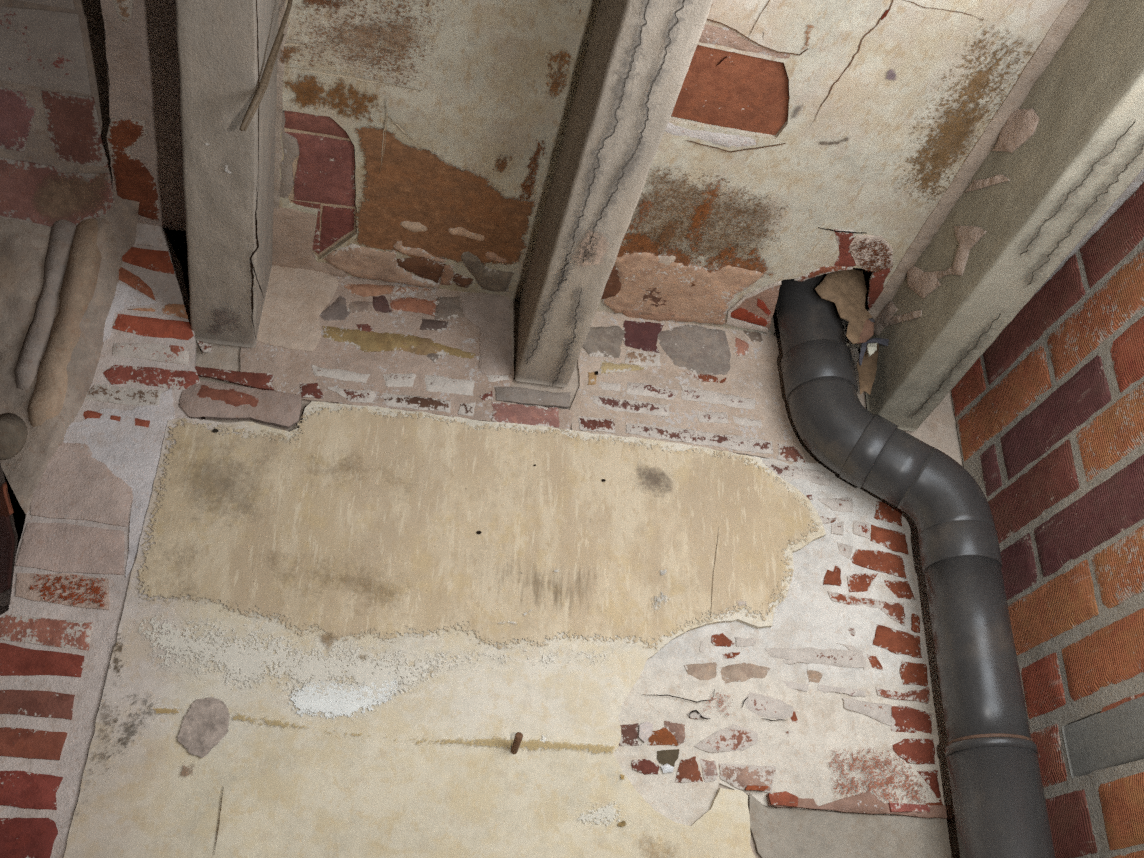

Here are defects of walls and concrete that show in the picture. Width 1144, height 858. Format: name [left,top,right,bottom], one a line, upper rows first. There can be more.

leakage [524,0,787,386]
crack [809,0,988,129]
leakage [899,25,1036,204]
spalling [240,221,954,826]